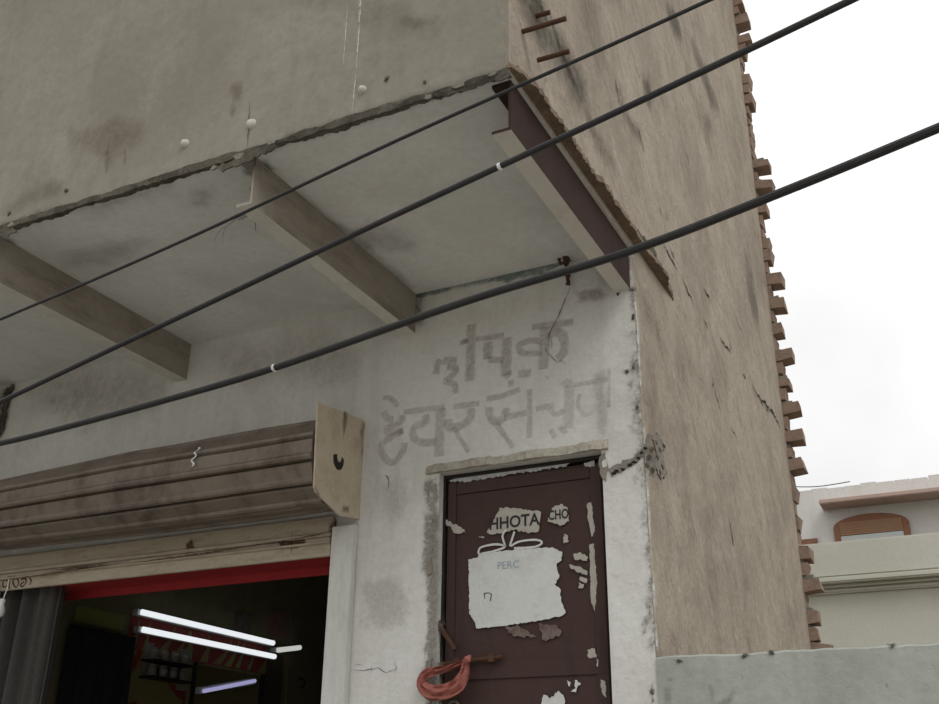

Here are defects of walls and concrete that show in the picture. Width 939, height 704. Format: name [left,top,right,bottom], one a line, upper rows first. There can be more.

spalling [423,70,509,100]
spalling [210,140,279,173]
crack [664,244,750,351]
crack [743,355,782,432]
peeling [599,433,668,481]